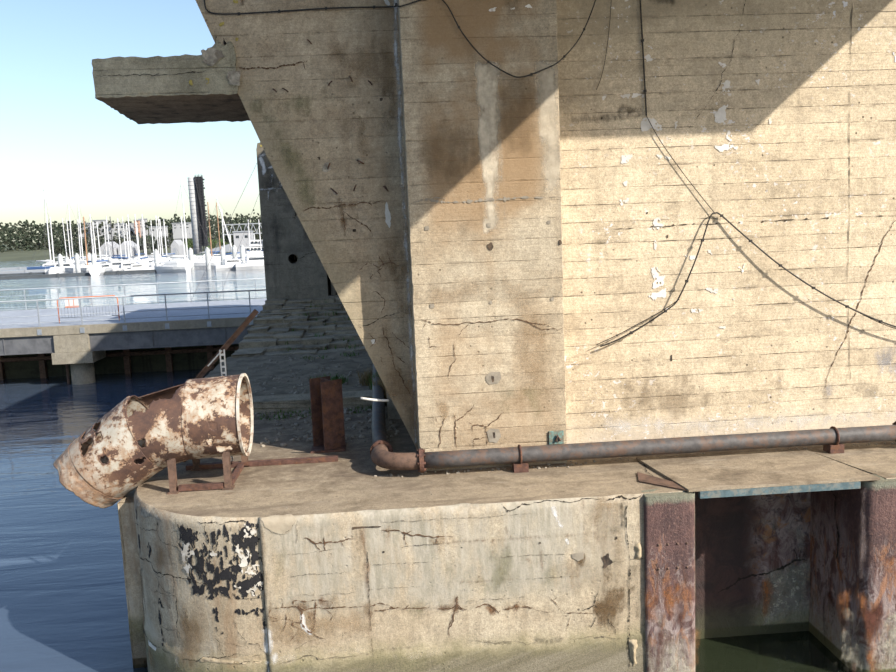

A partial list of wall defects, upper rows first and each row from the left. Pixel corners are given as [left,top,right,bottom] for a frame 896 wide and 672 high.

corrosion [862,597,882,668]